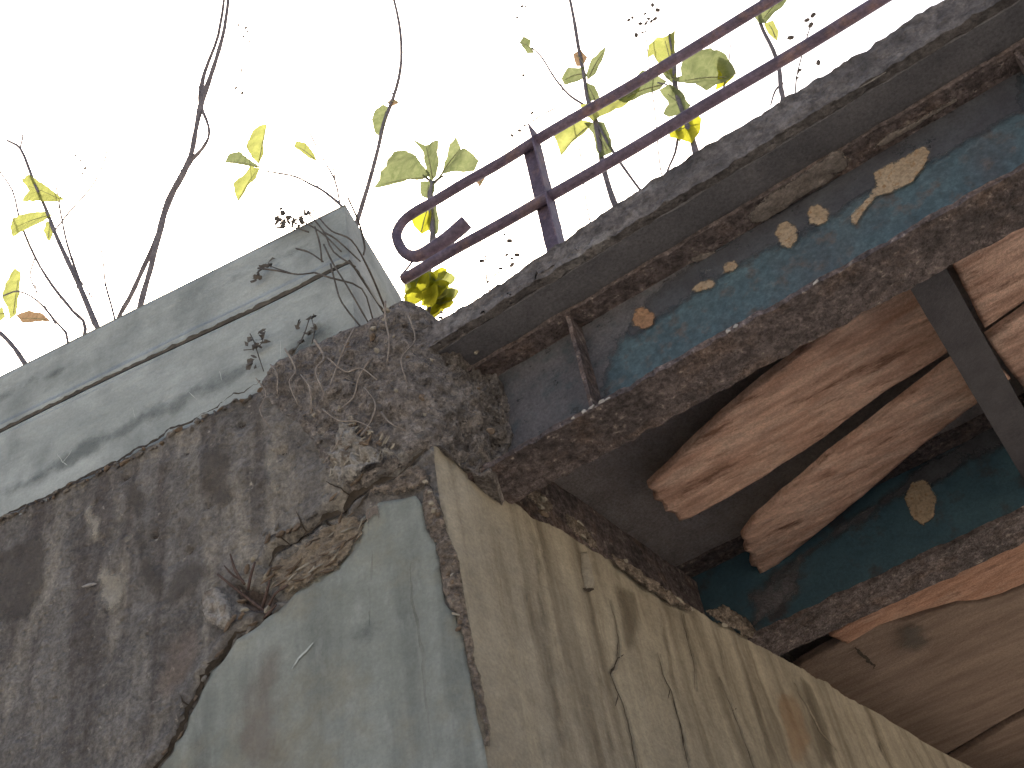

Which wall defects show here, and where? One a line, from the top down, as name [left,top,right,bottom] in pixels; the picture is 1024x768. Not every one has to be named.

peeling [850,147,930,225]
spalling [217,511,366,633]
spalling [368,466,490,746]
crack [609,599,639,768]